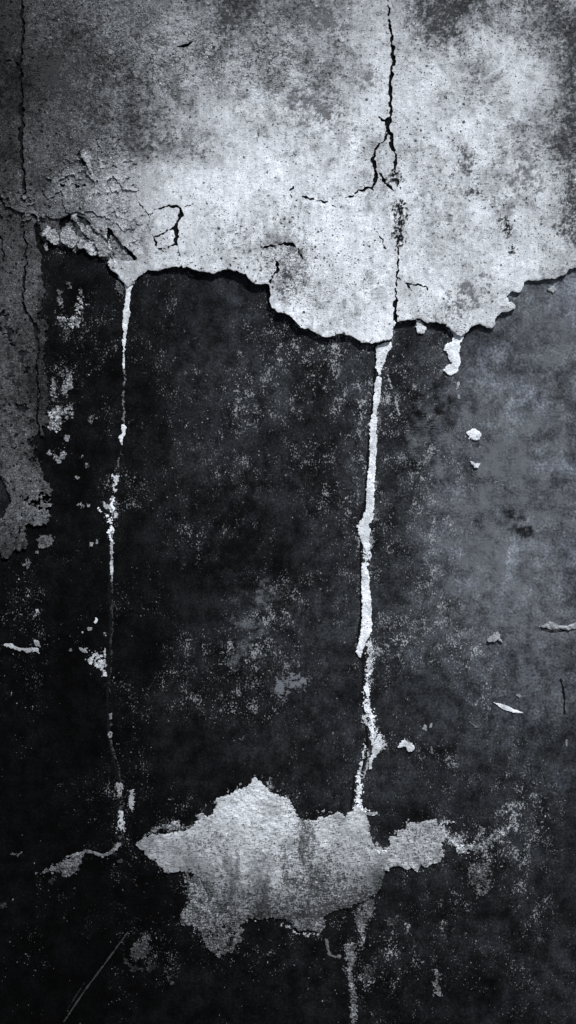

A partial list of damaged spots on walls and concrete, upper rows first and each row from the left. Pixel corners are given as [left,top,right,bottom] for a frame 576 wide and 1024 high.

crack [0,0,86,218]
crack [290,0,397,207]
crack [0,236,27,308]
crack [139,203,193,268]
peeling [0,188,576,344]
crack [374,228,428,324]
peeling [37,361,74,464]
leakage [356,342,392,568]
peeling [69,618,107,676]
leakage [354,638,387,812]
peeling [35,843,123,885]
spalling [136,775,532,1024]